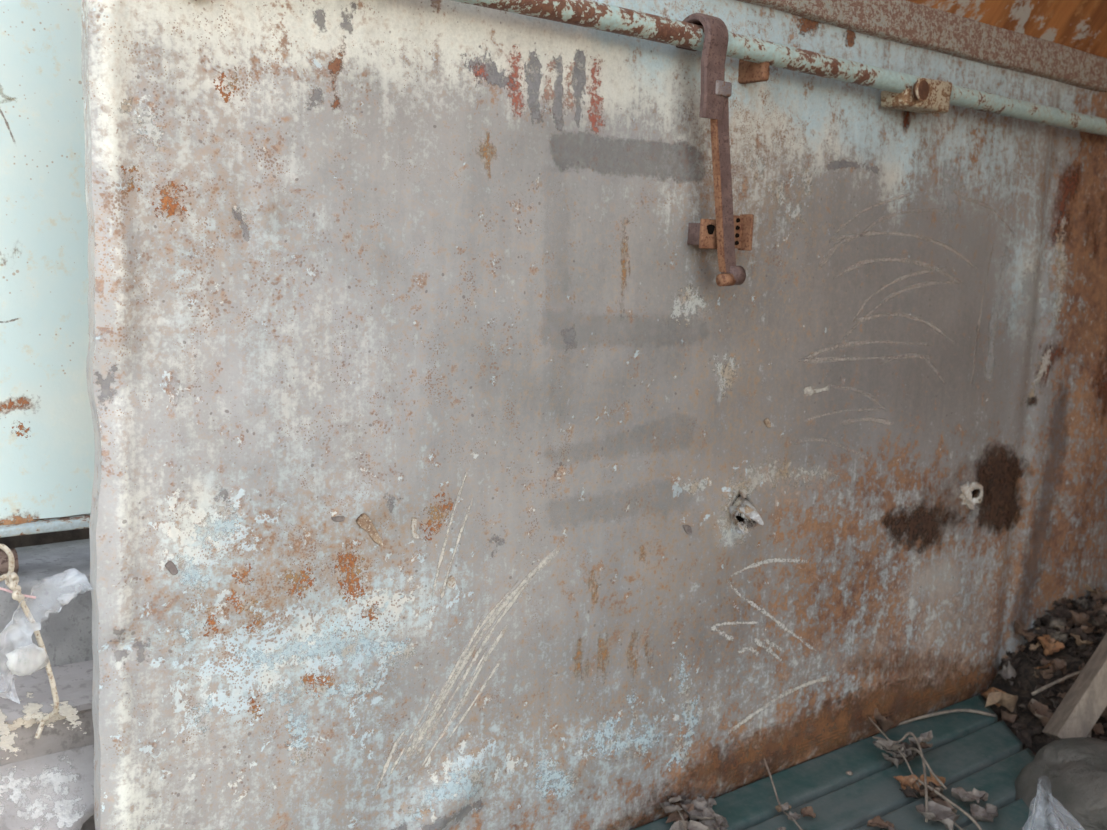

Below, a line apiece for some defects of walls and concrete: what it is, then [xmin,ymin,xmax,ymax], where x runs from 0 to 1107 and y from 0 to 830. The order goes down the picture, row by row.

rust [1052,166,1081,322]
rust [1021,345,1064,406]
rust [0,397,32,438]
rust [420,492,454,541]
leakage [882,505,961,552]
leakage [975,446,1022,531]
rust [203,564,265,637]
rust [283,564,317,599]
rust [334,543,379,621]
rust [299,671,340,698]
rust [610,654,996,830]